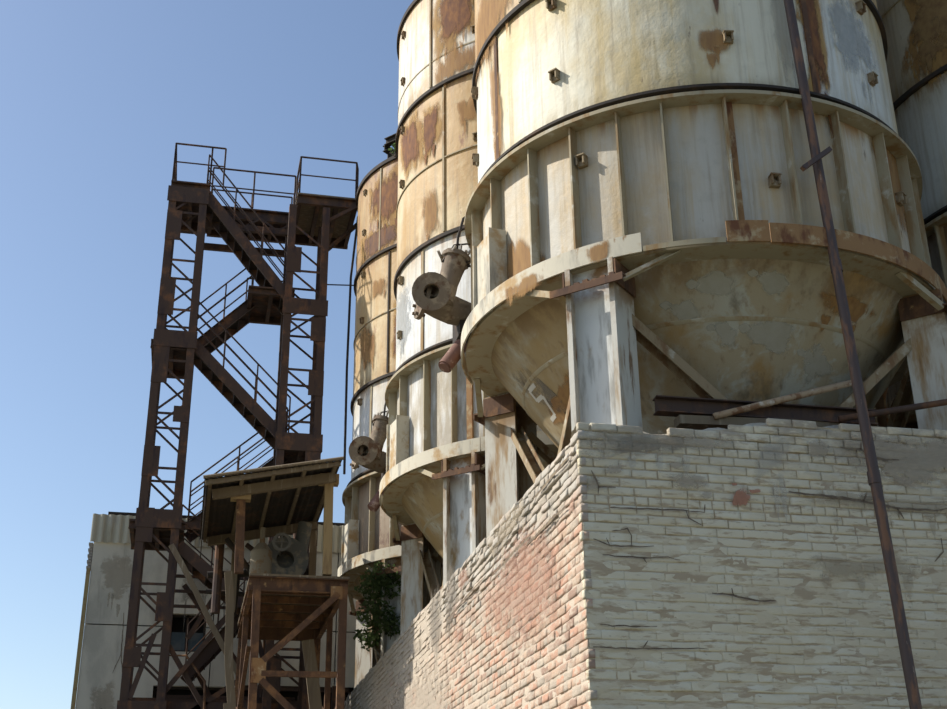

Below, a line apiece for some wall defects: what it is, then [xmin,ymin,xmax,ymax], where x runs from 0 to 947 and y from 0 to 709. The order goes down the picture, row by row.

rust [432,0,511,160]
rust [699,29,729,69]
rust [796,0,830,95]
rust [902,0,947,88]
rust [360,105,442,263]
flaking render [732,483,760,506]